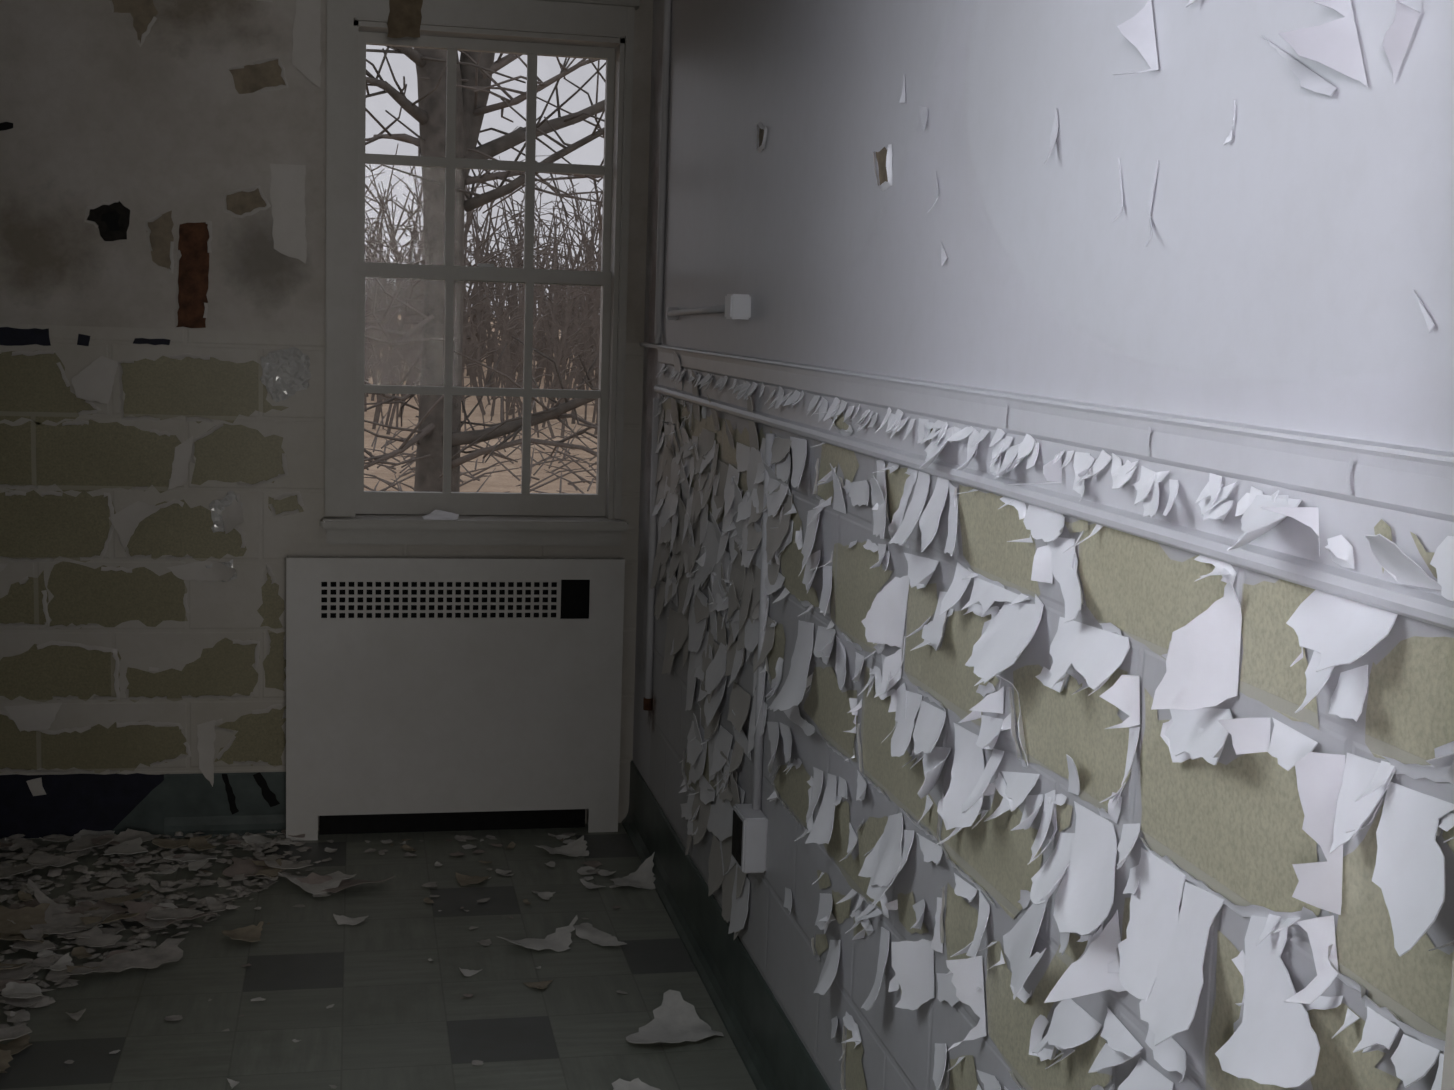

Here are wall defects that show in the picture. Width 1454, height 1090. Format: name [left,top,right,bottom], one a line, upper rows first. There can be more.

flaking render [109,0,158,47]
peeling [1113,0,1160,79]
peeling [1261,0,1371,98]
peeling [0,350,304,787]
peeling [650,352,1454,1090]
peeling [611,1078,660,1090]